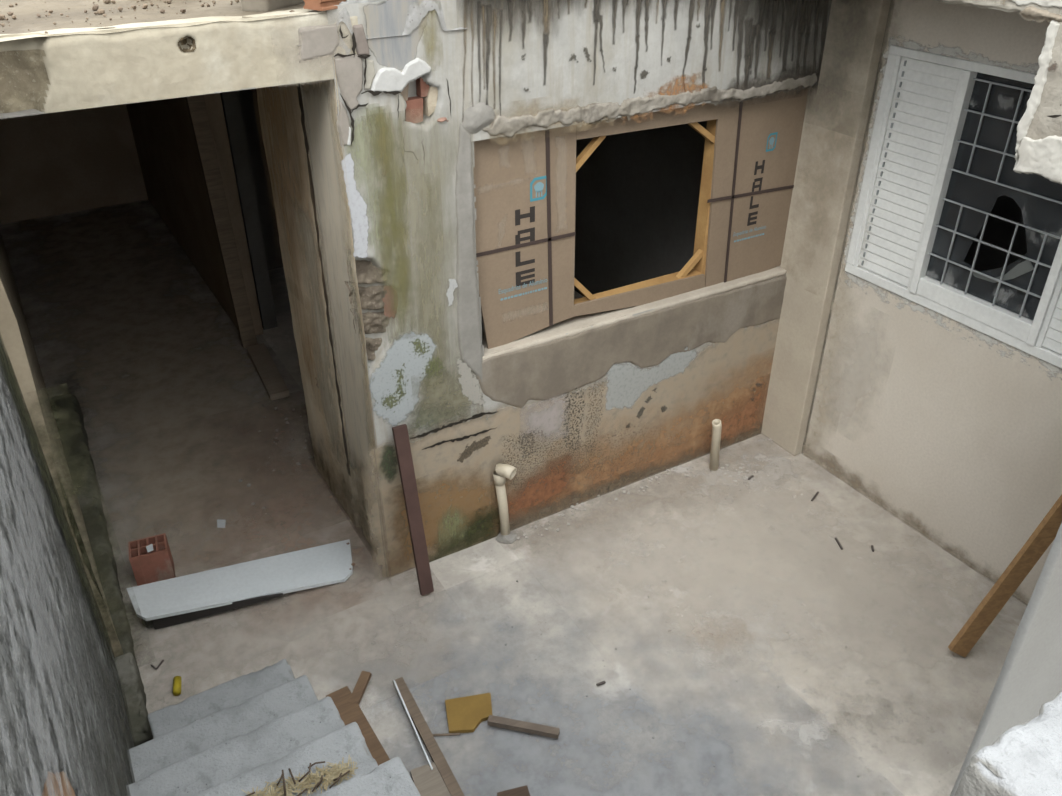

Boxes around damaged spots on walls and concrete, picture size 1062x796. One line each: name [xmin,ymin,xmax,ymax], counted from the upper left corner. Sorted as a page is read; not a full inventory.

spalling [0,49,51,113]
leakage [463,0,865,116]
peeling [1012,0,1062,184]
peeling [298,0,449,473]
leakage [375,108,408,323]
crack [409,412,497,450]
leakage [410,319,780,560]
peeling [606,347,697,410]
leakage [369,445,416,578]